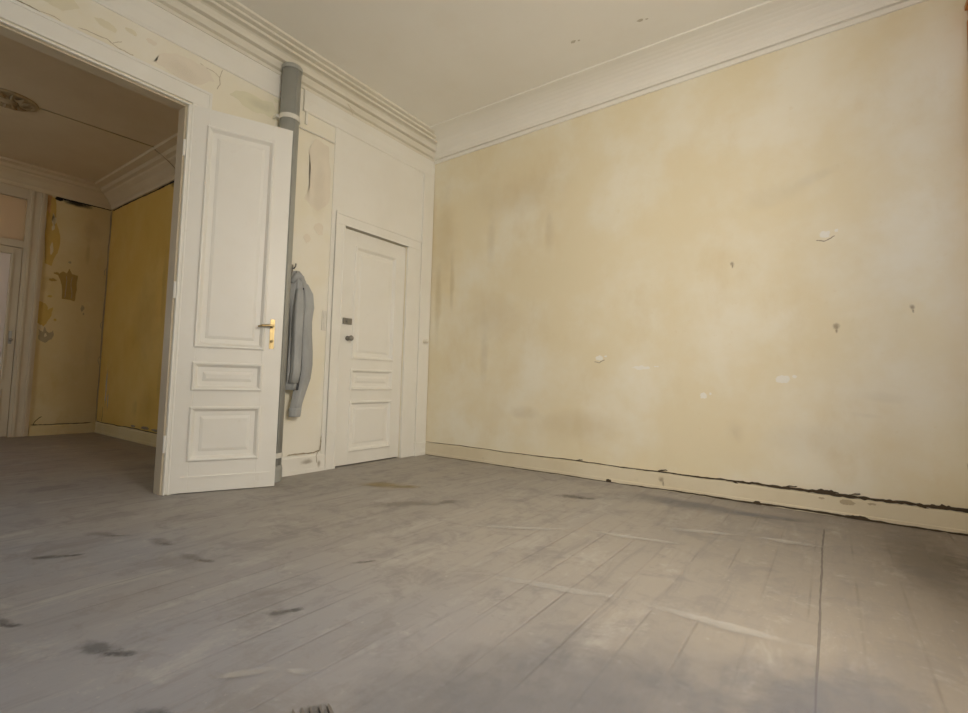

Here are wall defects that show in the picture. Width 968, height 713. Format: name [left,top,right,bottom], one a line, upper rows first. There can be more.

peeling [37,195,84,343]